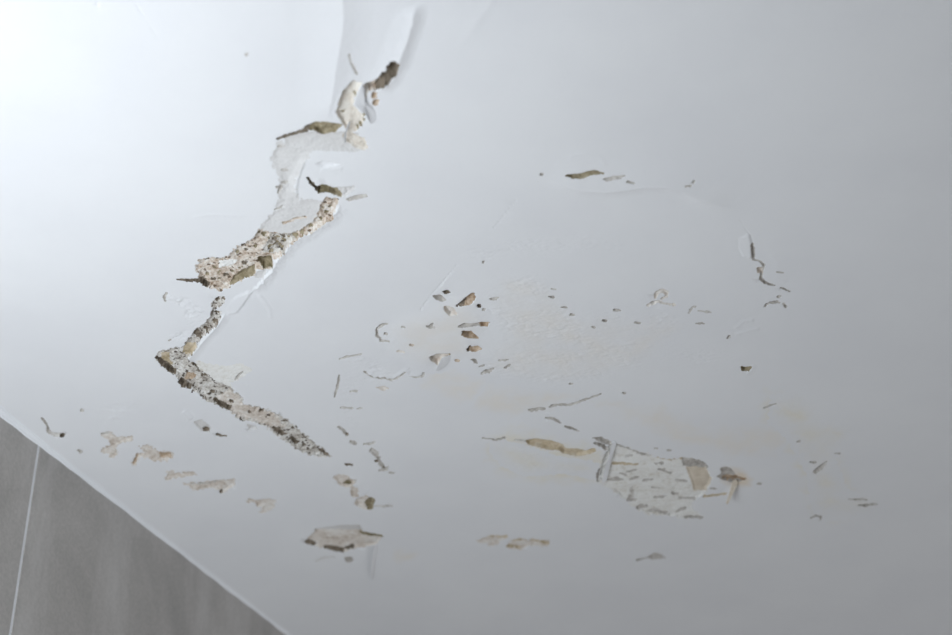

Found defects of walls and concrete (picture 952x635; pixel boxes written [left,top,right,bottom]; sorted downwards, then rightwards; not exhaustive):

spalling [155,61,400,474]
spalling [100,431,235,494]
spalling [333,473,393,510]
spalling [482,436,747,519]
spalling [304,524,383,580]
spalling [476,534,550,550]